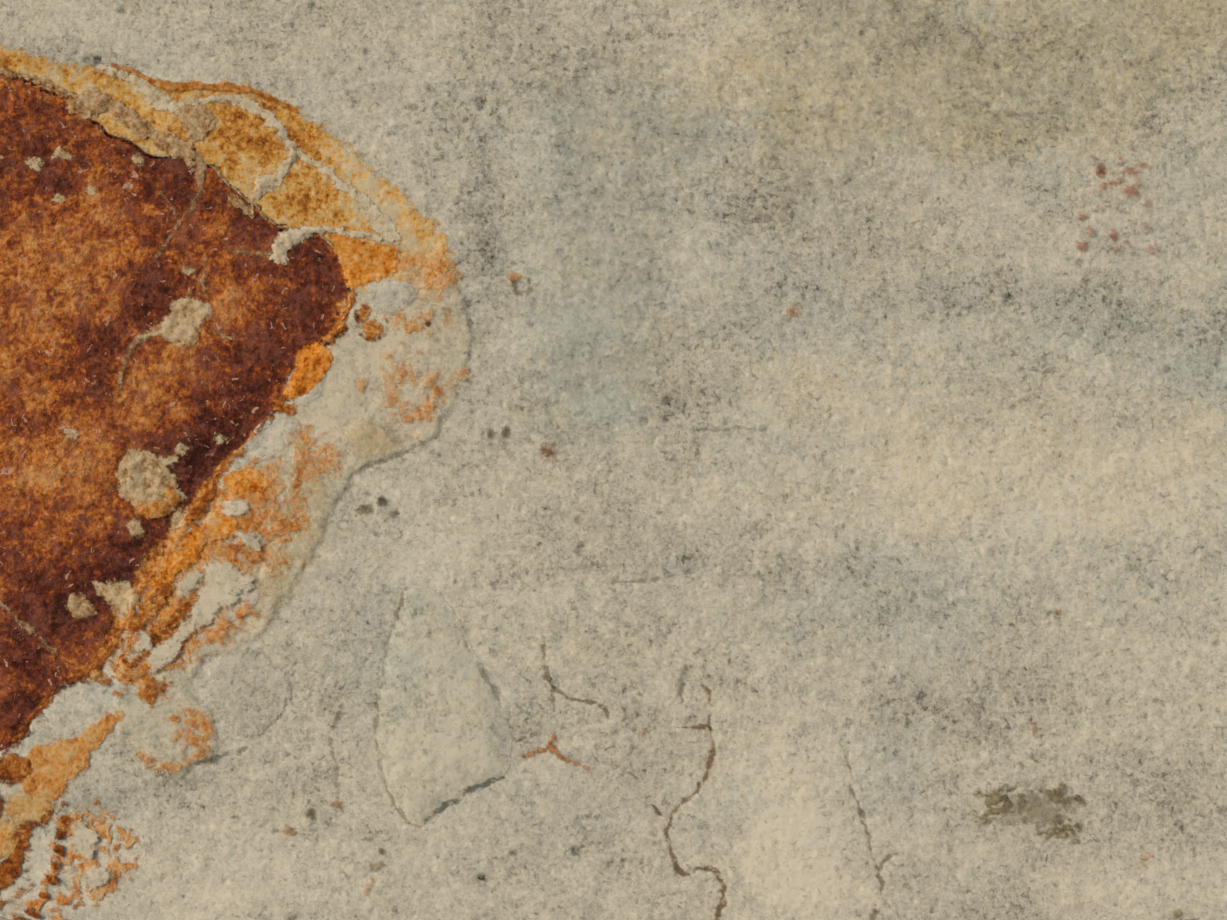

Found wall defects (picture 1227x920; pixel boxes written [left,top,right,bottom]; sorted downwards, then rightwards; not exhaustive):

peeling [72,820,110,889]
corrosion [0,234,471,920]
spalling [0,44,474,778]
crack [652,687,727,920]